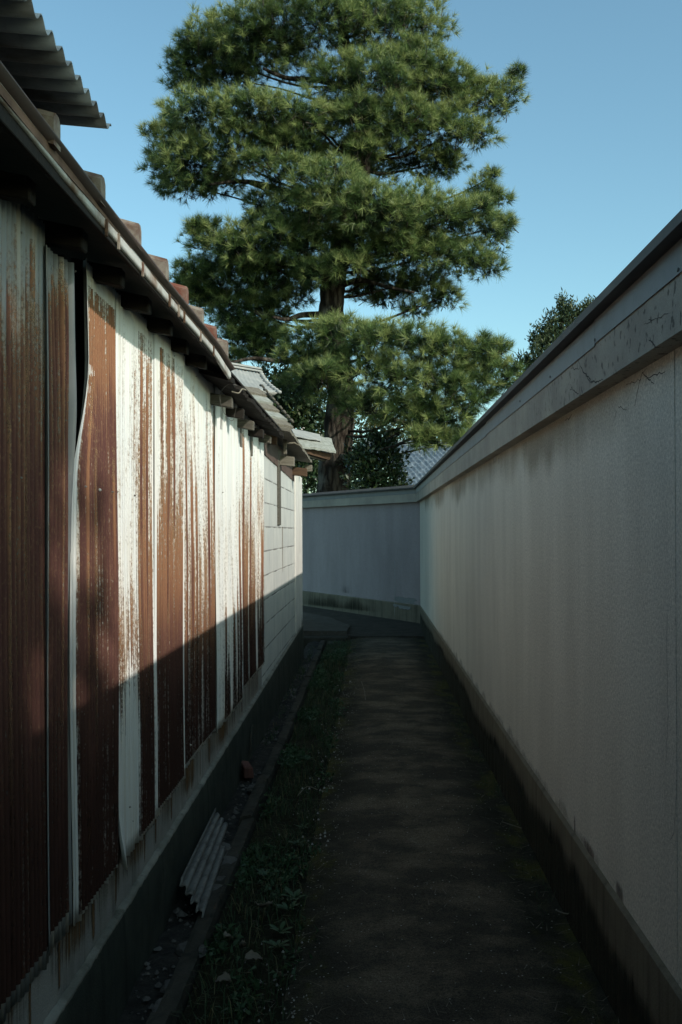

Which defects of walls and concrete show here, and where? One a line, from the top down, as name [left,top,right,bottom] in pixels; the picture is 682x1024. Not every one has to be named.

rust [0,230,265,1024]
crack [566,313,668,420]